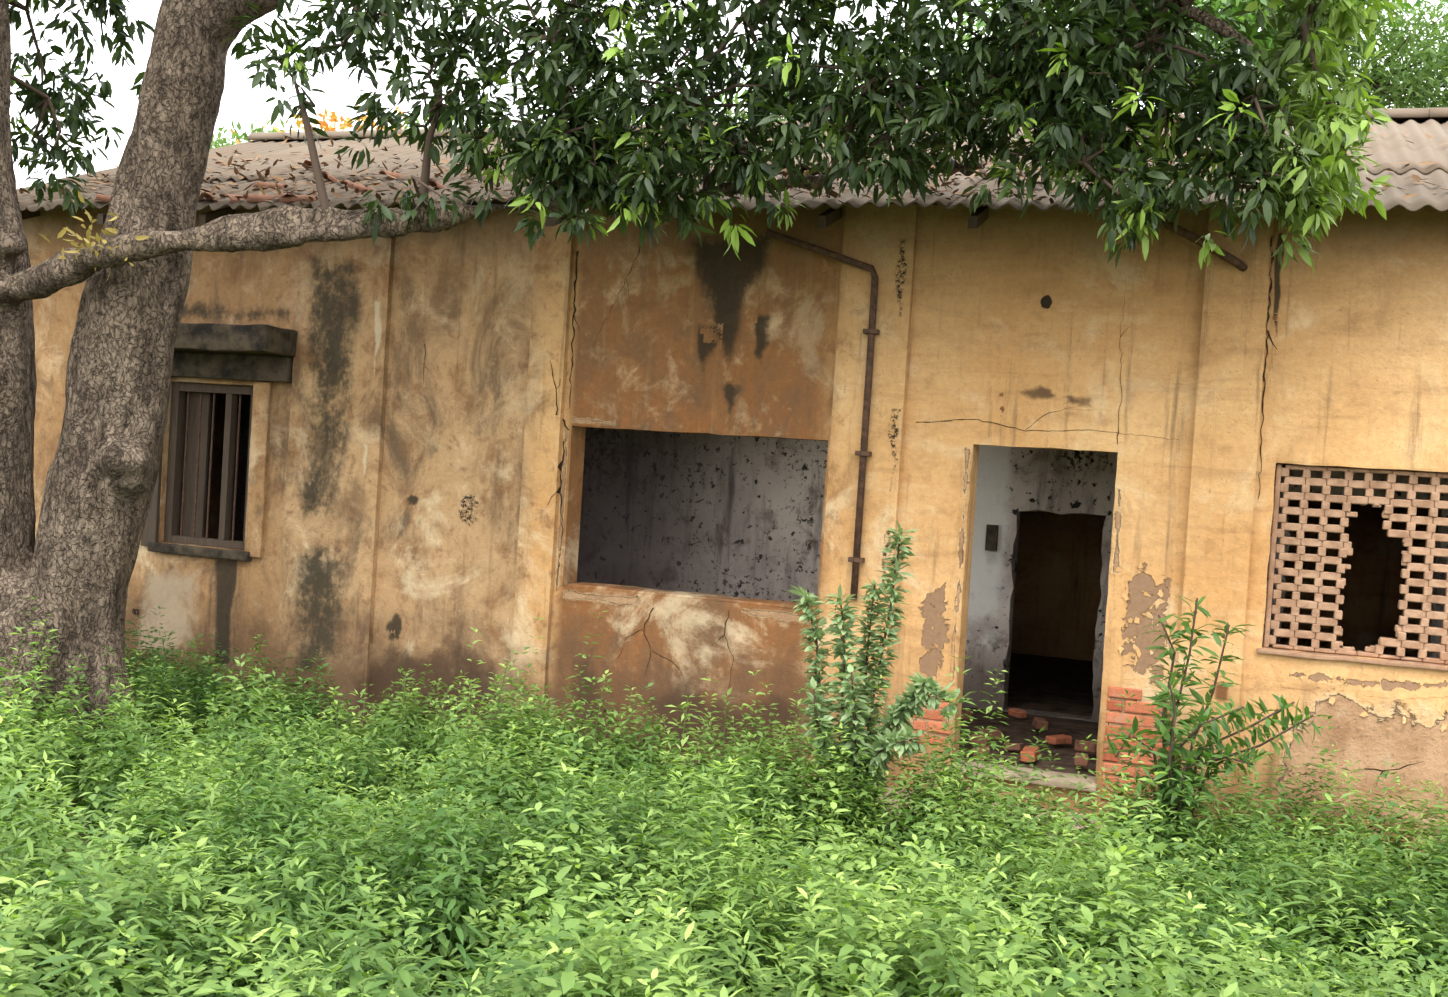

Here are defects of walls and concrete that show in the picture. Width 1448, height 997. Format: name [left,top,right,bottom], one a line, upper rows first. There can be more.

leakage [180,241,516,737]
leakage [673,219,788,428]
peeling [909,447,972,746]
crack [916,279,1178,444]
peeling [1101,487,1186,800]
crack [1258,236,1277,498]
spalling [1269,662,1448,834]